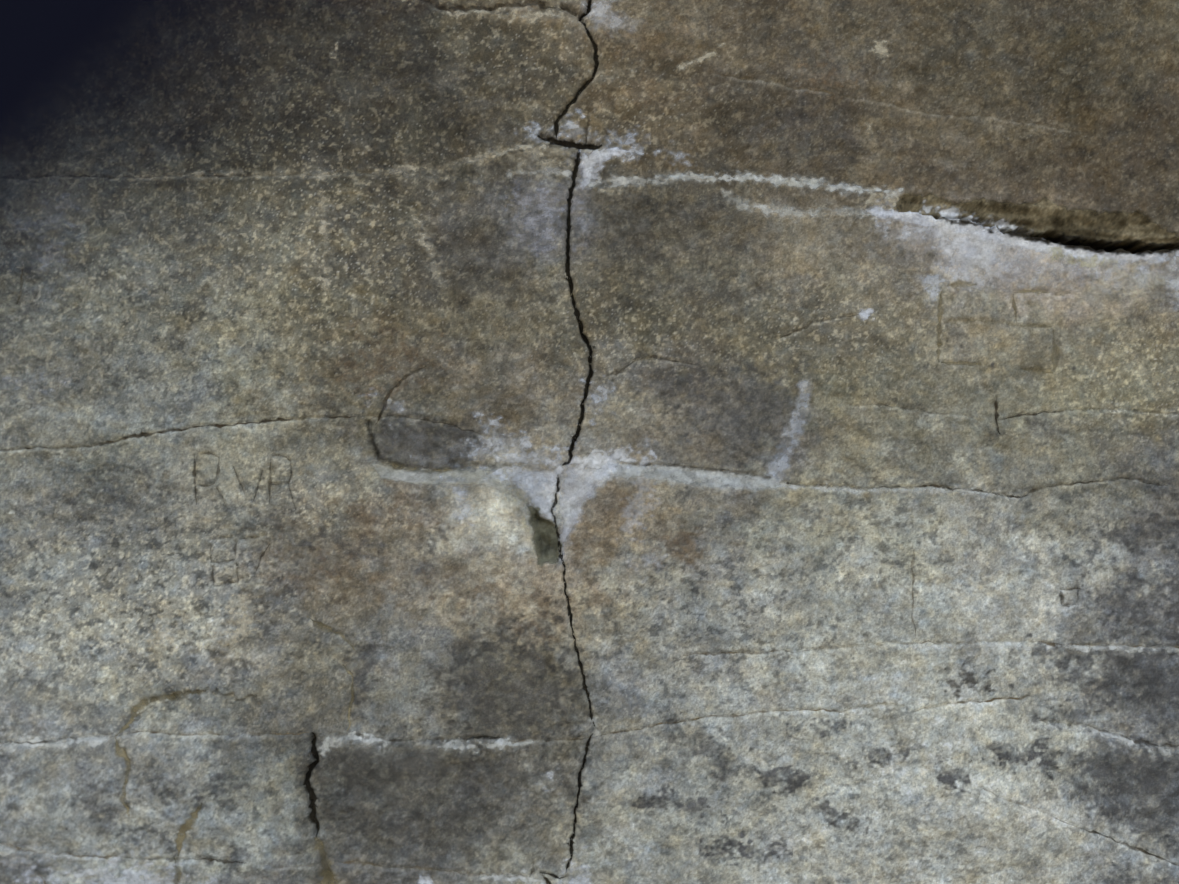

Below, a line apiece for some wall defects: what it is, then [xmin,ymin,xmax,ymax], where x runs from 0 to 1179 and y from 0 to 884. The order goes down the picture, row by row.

crack [101,418,290,445]
crack [429,0,702,884]
crack [307,616,355,731]
crack [958,696,1025,704]
crack [258,732,375,884]